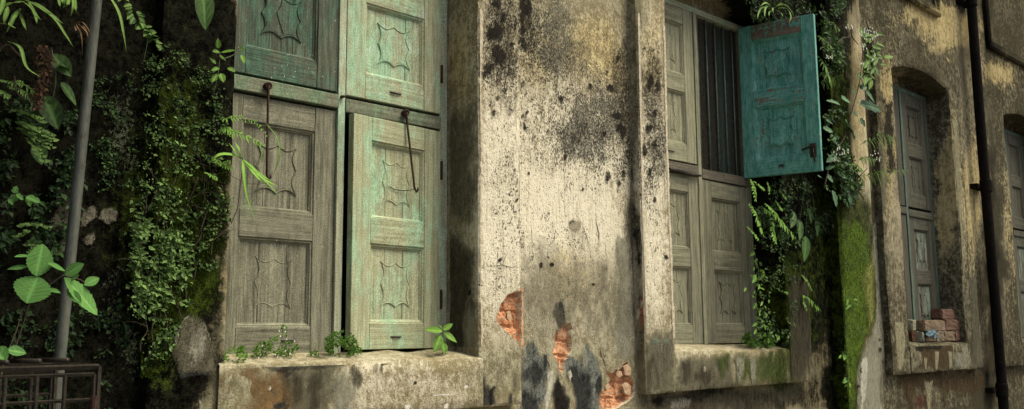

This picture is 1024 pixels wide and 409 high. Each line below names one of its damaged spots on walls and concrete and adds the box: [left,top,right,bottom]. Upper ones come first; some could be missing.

leakage [482,0,668,188]
leakage [263,364,363,409]
peeling [496,289,635,409]
leakage [606,200,812,409]
leakage [860,357,868,409]